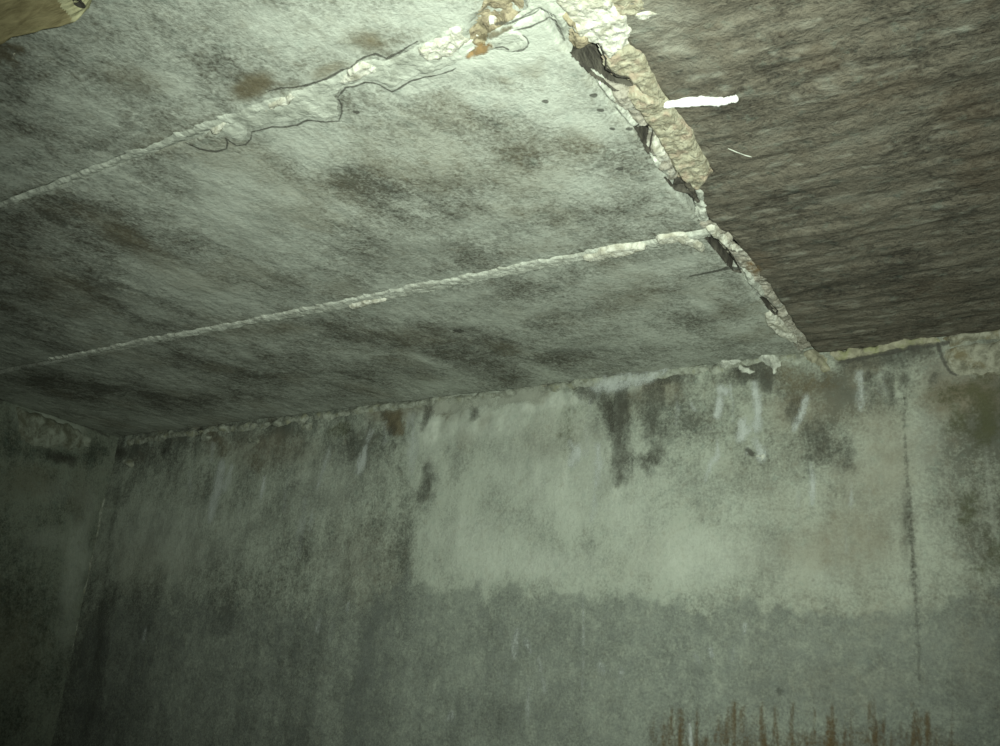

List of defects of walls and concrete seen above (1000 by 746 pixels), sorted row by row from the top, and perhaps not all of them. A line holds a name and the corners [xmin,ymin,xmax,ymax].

spalling [418,0,524,61]
crack [487,12,564,52]
crack [185,41,454,153]
spalling [556,0,812,351]
crack [690,266,741,277]
water stain [581,382,660,480]
water stain [714,386,728,418]
water stain [737,362,828,442]